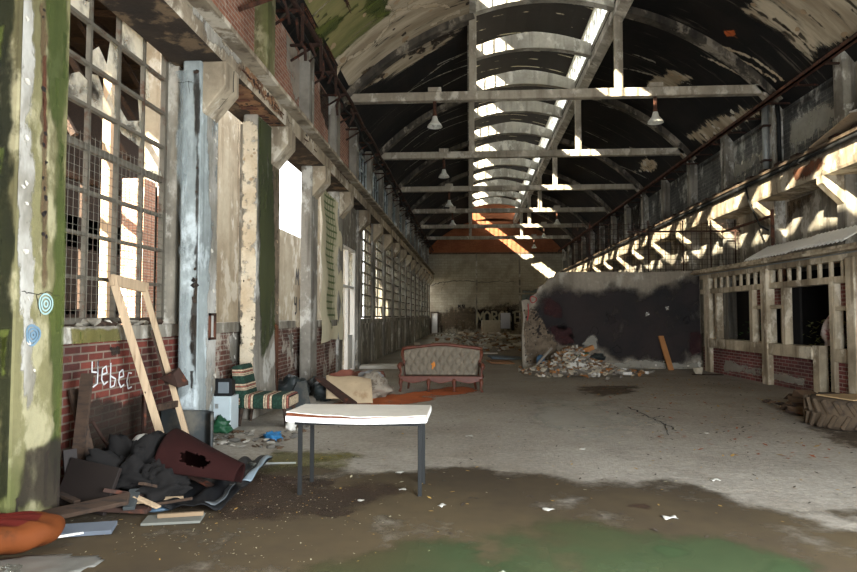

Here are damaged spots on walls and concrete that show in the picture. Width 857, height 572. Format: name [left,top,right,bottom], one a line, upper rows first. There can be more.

water stain [310,0,461,75]
peeling [742,0,857,61]
peeling [648,69,692,87]
peeling [687,106,760,145]
rust [793,157,823,181]
spalling [522,290,557,364]
water stain [0,465,857,572]